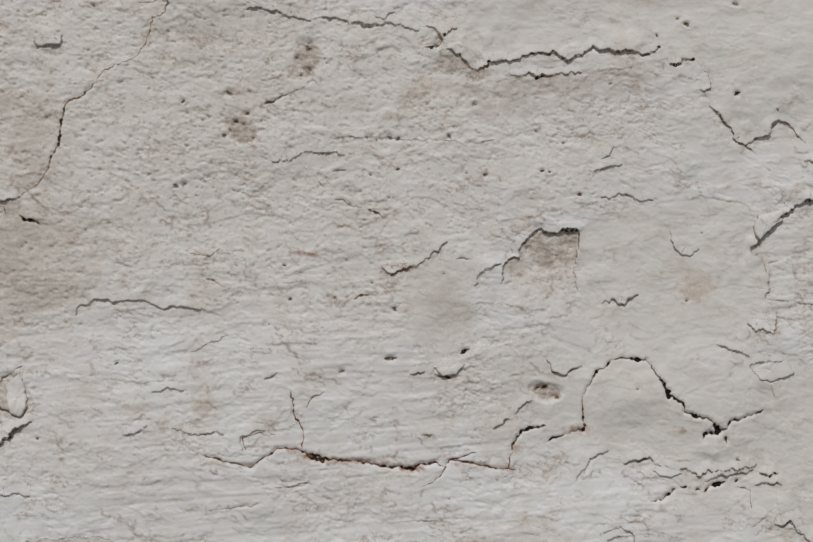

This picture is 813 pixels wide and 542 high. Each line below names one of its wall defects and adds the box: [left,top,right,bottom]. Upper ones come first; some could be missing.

peeling [242,0,661,80]
peeling [668,52,711,91]
crack [3,0,169,225]
peeling [271,142,347,163]
peeling [709,100,809,151]
peeling [600,185,654,202]
peeling [382,235,448,276]
peeling [469,220,587,290]
peeling [743,190,813,299]
peeling [0,365,32,445]
crack [201,357,764,485]
peeling [774,511,813,542]